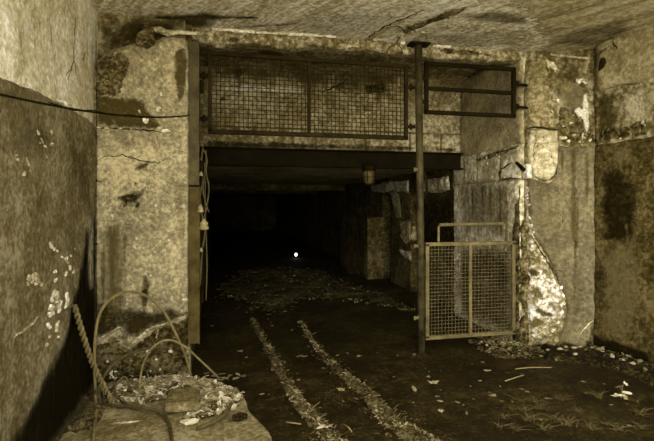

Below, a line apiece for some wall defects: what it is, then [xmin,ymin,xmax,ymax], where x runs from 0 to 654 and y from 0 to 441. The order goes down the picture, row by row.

spalling [135,25,203,49]
crack [366,10,424,41]
peeling [95,52,171,132]
damp [175,49,187,100]
spalling [550,86,648,143]
crack [97,153,174,164]
peeling [512,182,566,343]
damp [602,148,638,333]
damp [13,156,178,441]